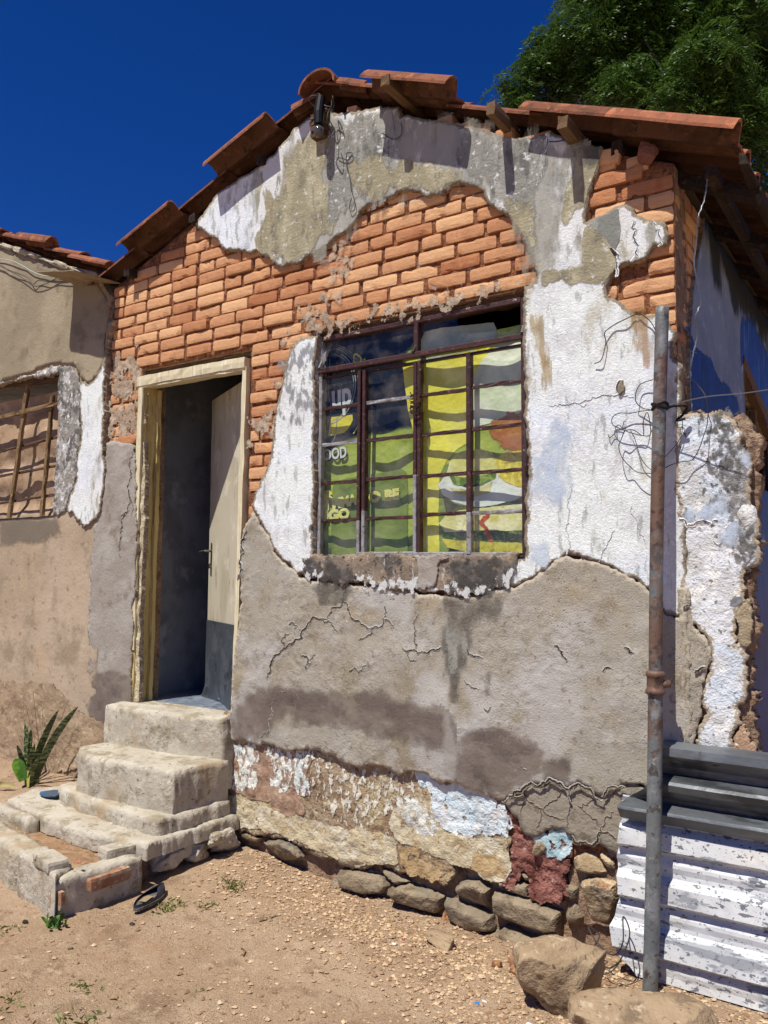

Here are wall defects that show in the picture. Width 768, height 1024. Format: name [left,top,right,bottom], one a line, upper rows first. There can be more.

spalling [291,93,316,122]
spalling [107,186,537,491]
crack [260,583,491,738]
water stain [231,555,569,795]
peeling [228,741,618,928]
crack [502,767,645,856]
spalling [734,598,754,648]
spalling [733,723,758,751]